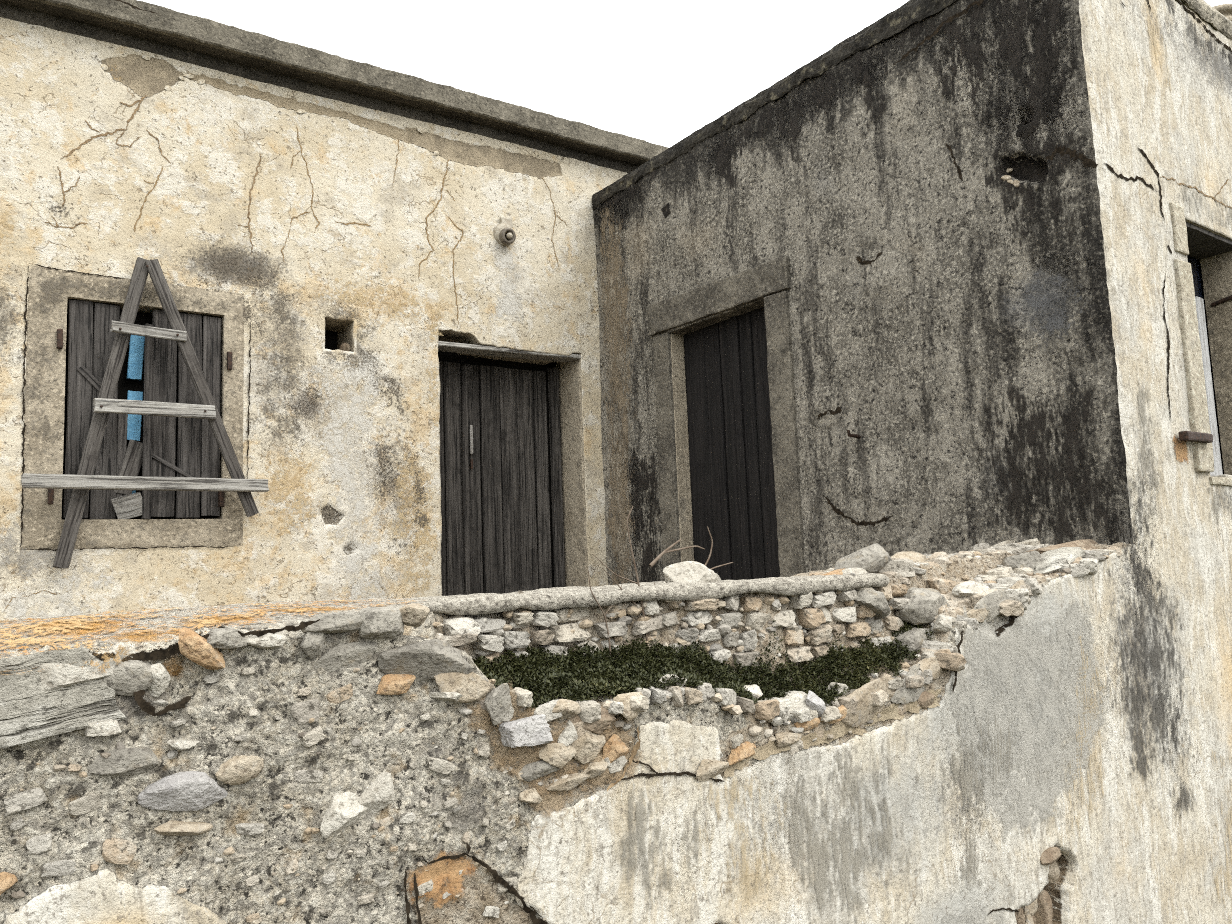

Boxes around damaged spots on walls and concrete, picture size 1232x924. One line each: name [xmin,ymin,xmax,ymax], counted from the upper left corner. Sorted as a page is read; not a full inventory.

crack [43,95,171,232]
water stain [172,237,329,533]
crack [237,126,371,261]
flaking render [101,52,562,179]
water stain [318,278,443,415]
crack [418,159,464,324]
water stain [895,0,1085,249]
spalling [1001,155,1047,191]
crack [1045,145,1232,419]
water stain [942,386,1196,885]
flaking render [724,689,941,778]
spalling [1015,847,1068,924]